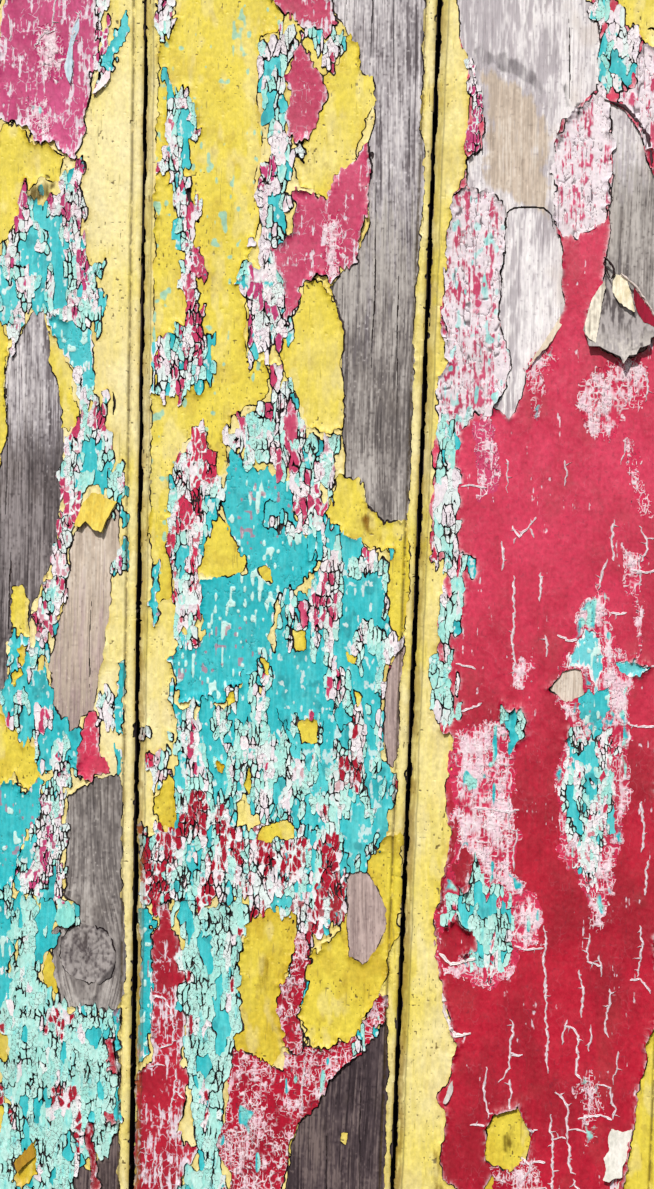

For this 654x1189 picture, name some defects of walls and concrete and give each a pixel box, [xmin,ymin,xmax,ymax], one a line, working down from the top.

peeling [0,0,130,1189]
peeling [134,0,654,1189]
crack [433,342,654,1189]